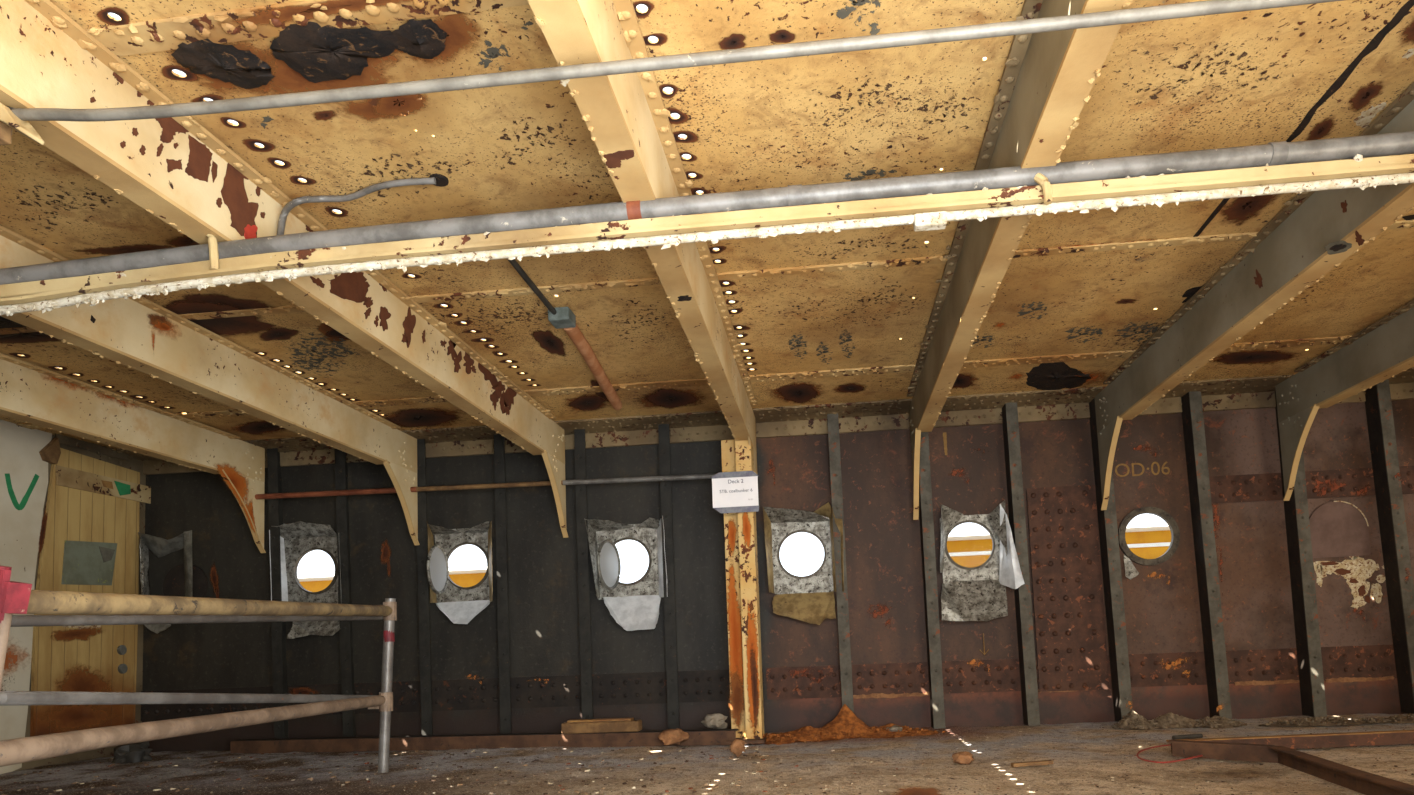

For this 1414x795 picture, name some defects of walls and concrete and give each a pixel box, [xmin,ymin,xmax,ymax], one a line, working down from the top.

rust [161,0,479,121]
peeling [113,72,265,239]
rust [220,117,316,185]
peeling [1015,199,1179,216]
peeling [583,233,778,252]
peeling [0,256,517,415]
peeling [474,296,551,338]
rust [637,389,704,408]
rust [772,382,864,403]
rust [1011,362,1105,390]
peeling [1313,556,1386,609]
rust [727,512,760,733]